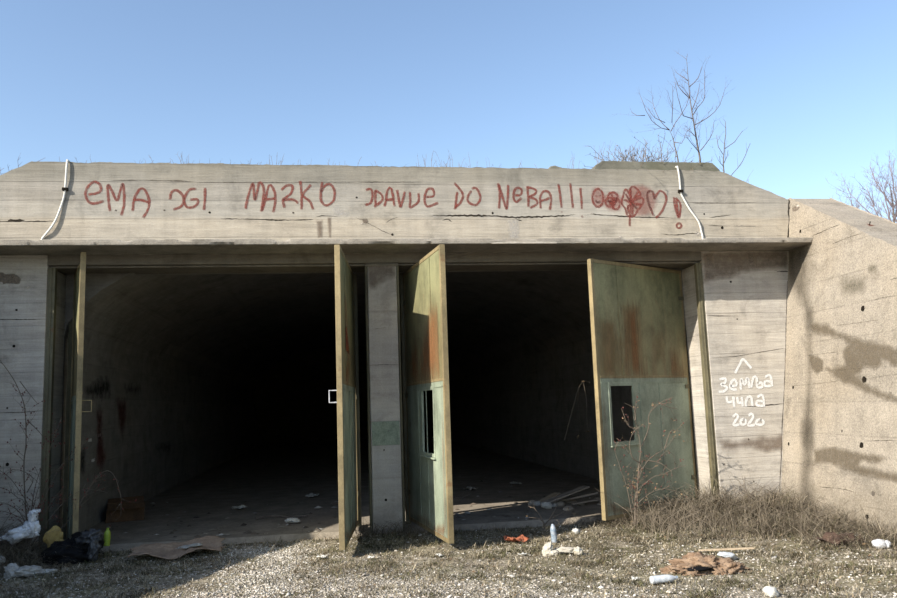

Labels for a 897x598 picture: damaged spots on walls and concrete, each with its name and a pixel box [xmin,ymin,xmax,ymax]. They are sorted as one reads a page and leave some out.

water stain [810,357,822,372]
water stain [813,324,897,398]
water stain [815,448,897,481]